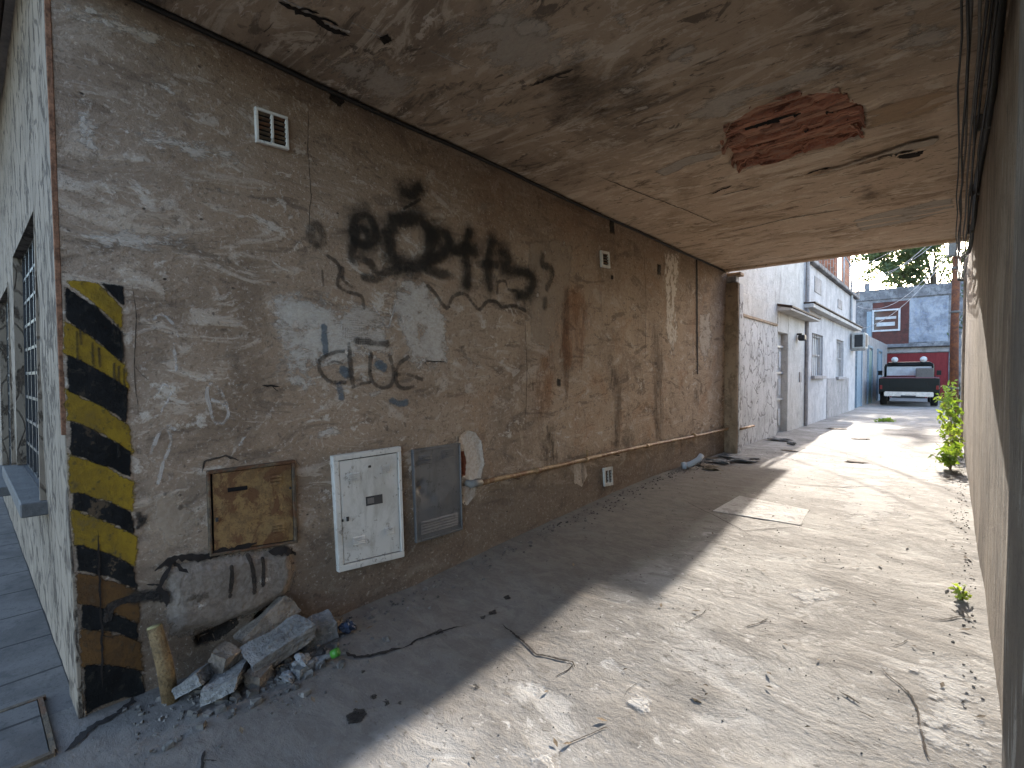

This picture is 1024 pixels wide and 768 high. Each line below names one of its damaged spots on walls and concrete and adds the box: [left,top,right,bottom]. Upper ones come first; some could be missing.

crack [278,0,350,36]
spalling [719,87,867,173]
crack [806,138,939,176]
spalling [459,430,485,505]
crack [346,626,461,658]
crack [503,625,575,676]